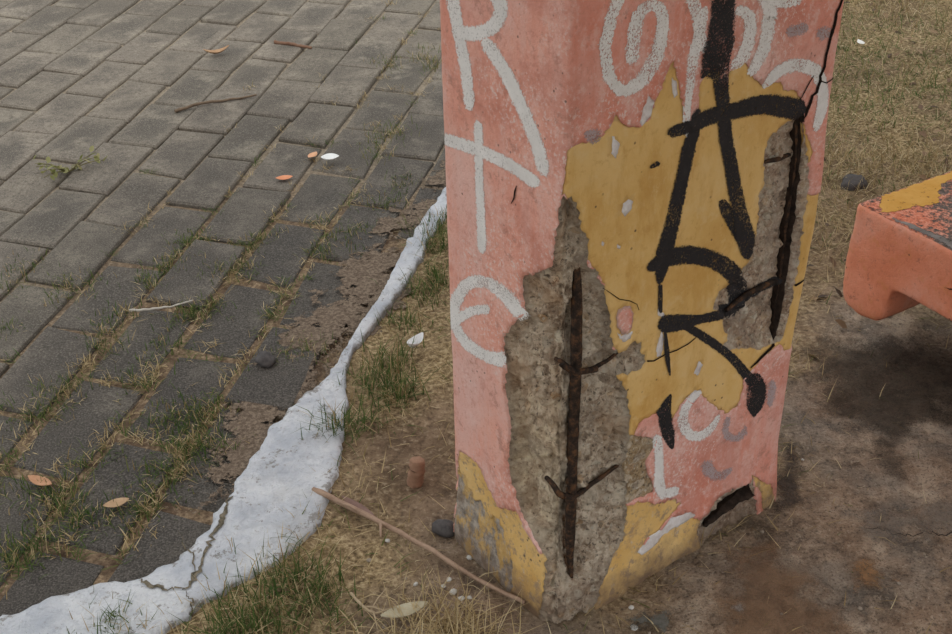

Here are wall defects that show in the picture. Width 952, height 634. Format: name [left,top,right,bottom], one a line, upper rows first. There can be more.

peeling [454,61,819,624]
crack [799,0,843,123]